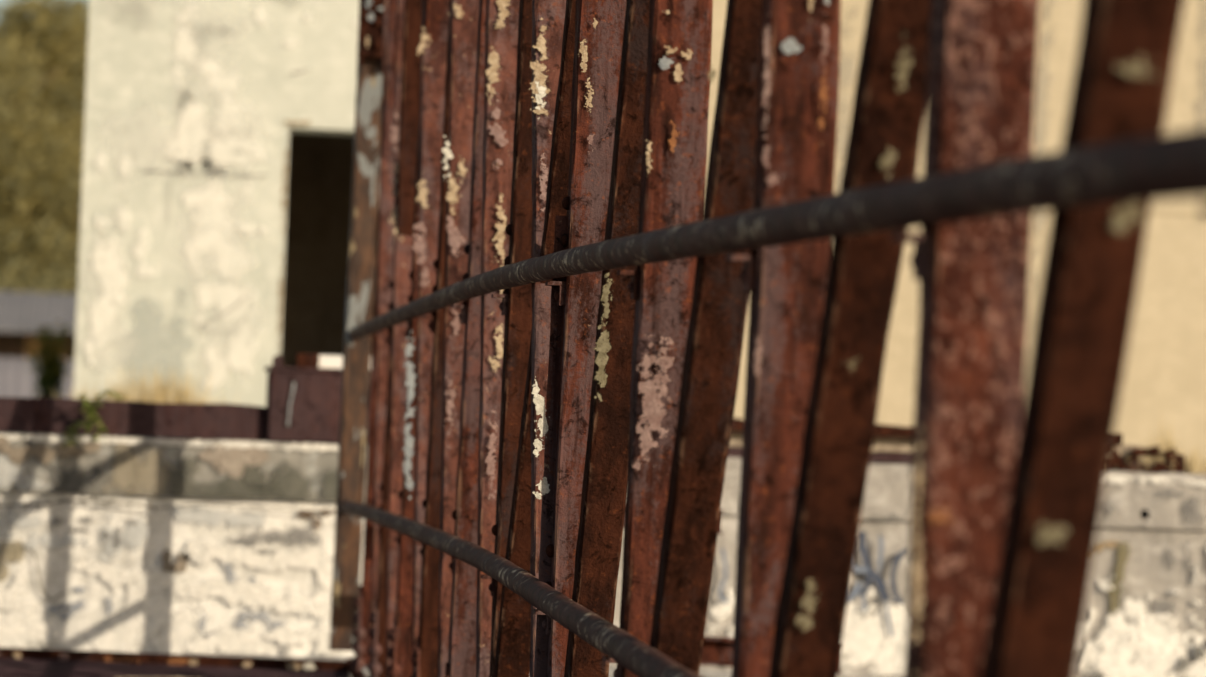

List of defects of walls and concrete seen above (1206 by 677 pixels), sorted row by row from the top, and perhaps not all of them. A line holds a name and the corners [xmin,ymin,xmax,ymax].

peeling [485,47,508,169]
peeling [530,18,551,119]
peeling [579,18,598,113]
peeling [659,45,693,84]
peeling [442,135,468,257]
peeling [492,193,507,267]
peeling [488,323,504,372]
peeling [402,331,416,500]
peeling [531,376,548,457]
peeling [632,335,675,470]
corrosion [1108,445,1185,473]
damp [0,433,339,655]